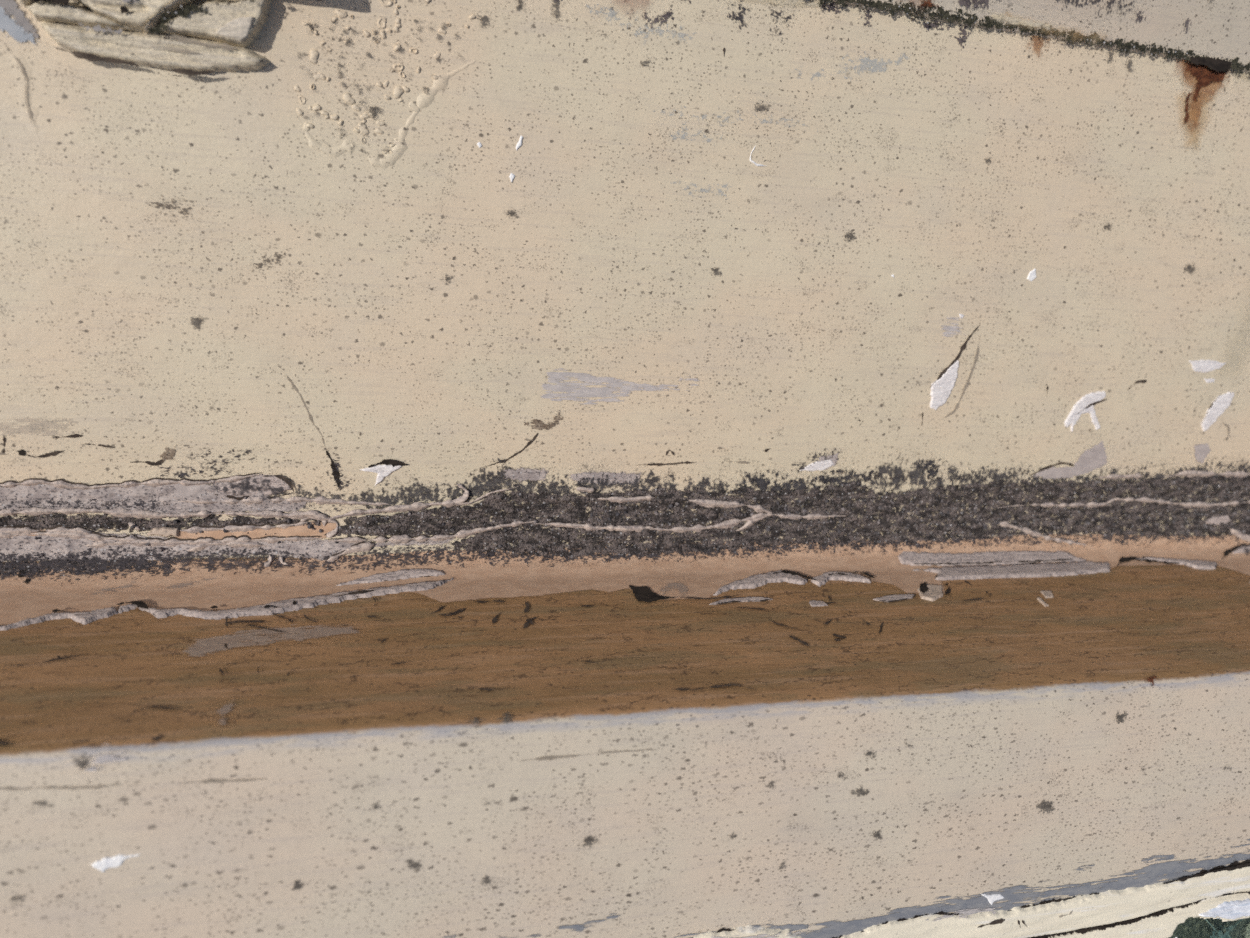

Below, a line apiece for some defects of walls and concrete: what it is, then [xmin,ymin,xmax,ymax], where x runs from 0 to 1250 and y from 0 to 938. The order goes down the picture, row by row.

peeling [0,0,39,44]
corrosion [1183,56,1232,126]
peeling [930,314,980,420]
peeling [360,459,408,486]
peeling [791,448,839,473]
peeling [1029,391,1143,480]
peeling [1164,360,1250,478]
peeling [0,467,1250,631]
peeling [92,854,141,872]
peeling [559,913,621,931]
peeling [743,839,1250,938]